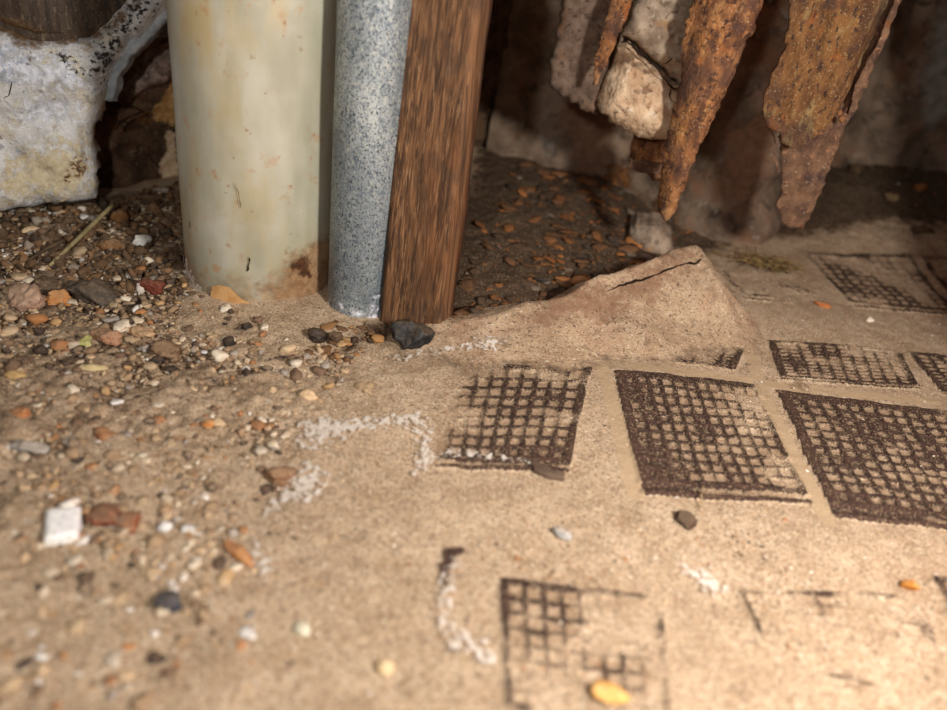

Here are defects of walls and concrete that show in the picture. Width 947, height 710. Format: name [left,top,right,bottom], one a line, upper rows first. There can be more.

corrosion [264,256,325,299]
crack [611,258,702,290]
efflorescence [246,411,531,584]